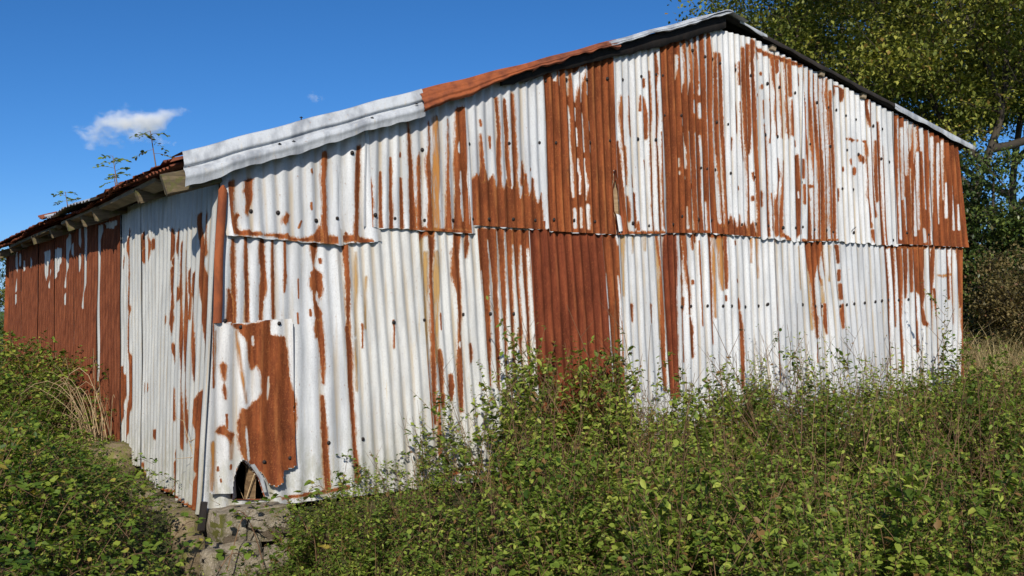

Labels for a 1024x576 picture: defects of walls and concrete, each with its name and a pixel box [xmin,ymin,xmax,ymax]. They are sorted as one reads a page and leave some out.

rust [121,228,155,439]
rust [161,212,227,510]
rust [215,33,969,500]